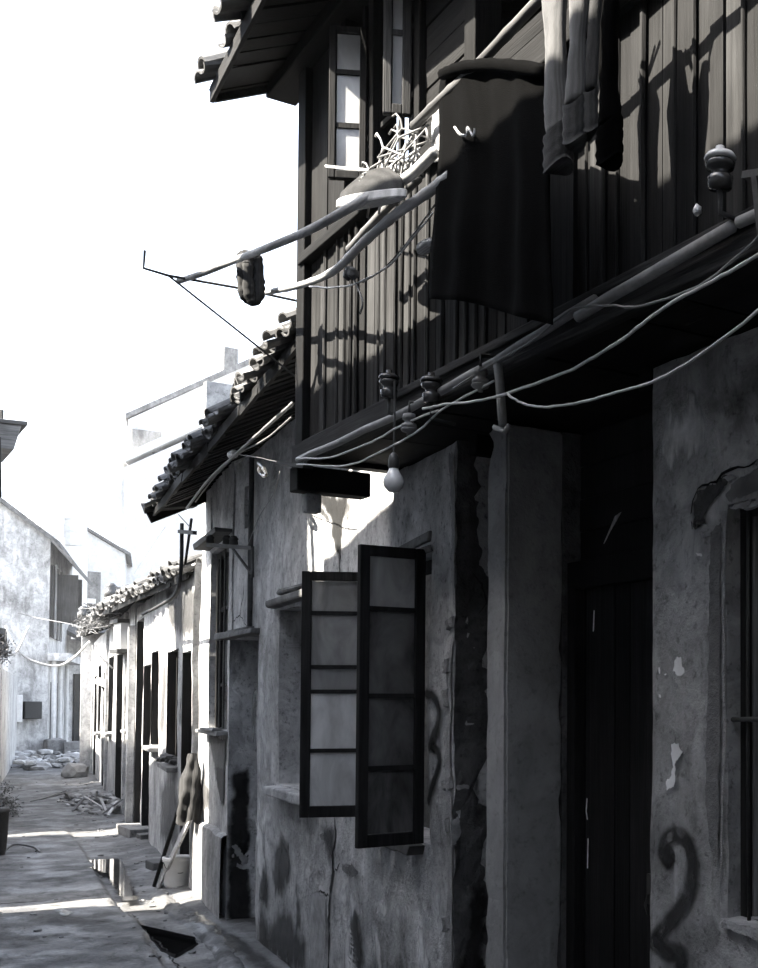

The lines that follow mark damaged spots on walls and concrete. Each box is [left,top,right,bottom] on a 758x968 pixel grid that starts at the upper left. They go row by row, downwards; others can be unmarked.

crack [690,459,758,529]
peeling [658,657,684,676]
peeling [689,460,758,917]
flaking render [440,616,469,968]
peeling [666,743,682,790]
damp [341,890,381,968]